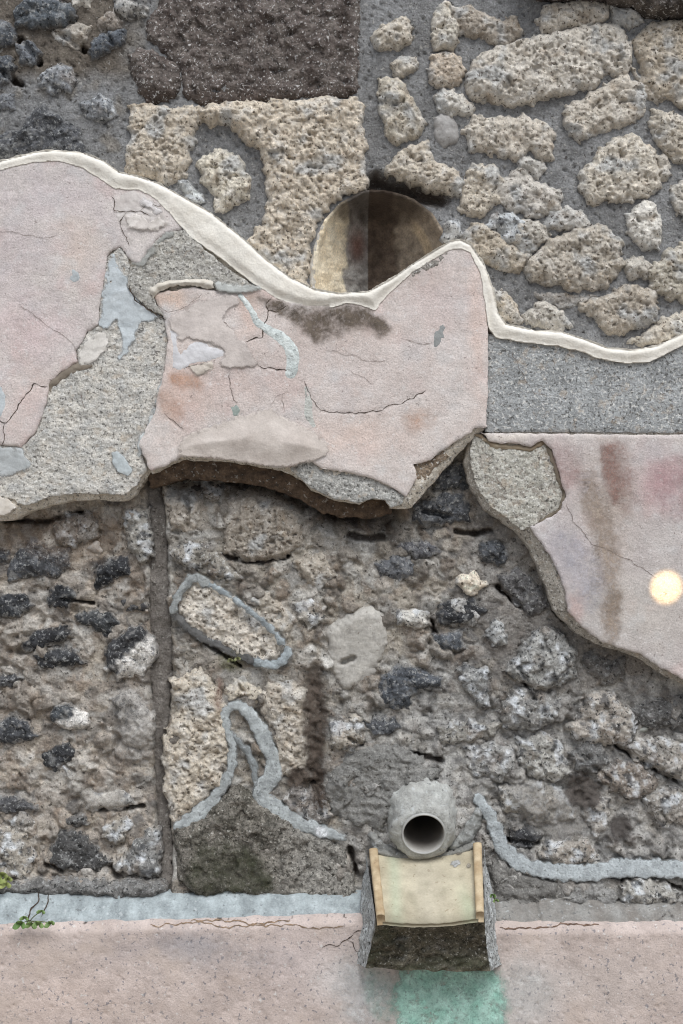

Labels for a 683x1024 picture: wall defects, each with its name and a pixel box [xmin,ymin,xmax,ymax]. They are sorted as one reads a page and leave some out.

crack [112,197,160,244]
spalling [0,190,405,519]
crack [224,293,425,428]
crack [0,383,47,445]
spalling [470,434,566,530]
crack [566,504,654,577]
leakage [287,668,327,812]
crack [151,919,360,952]
crack [500,922,599,930]
leakage [348,969,549,1024]